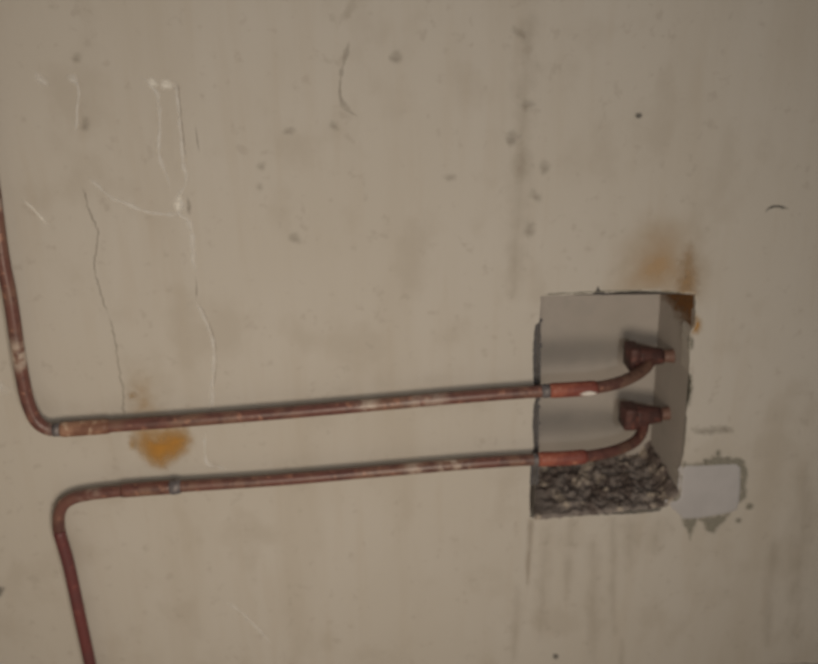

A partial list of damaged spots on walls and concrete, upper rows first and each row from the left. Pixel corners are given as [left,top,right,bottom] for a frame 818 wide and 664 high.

corrosion [666,271,699,331]
spalling [533,318,543,385]
corrosion [145,436,185,463]
spalling [532,398,540,453]
spalling [530,440,682,520]